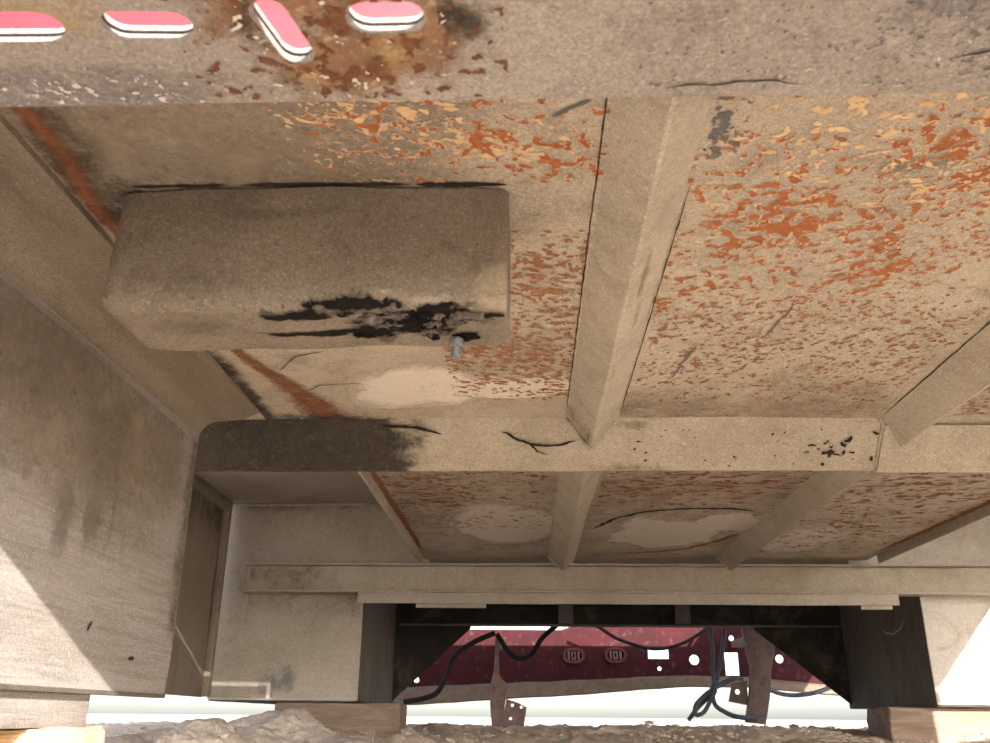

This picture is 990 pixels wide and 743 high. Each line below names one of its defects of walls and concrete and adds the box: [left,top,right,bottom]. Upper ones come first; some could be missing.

corrosion [184,0,611,183]
corrosion [11,107,131,235]
crack [552,98,607,412]
corrosion [628,93,990,403]
corrosion [443,230,591,400]
corrosion [213,349,372,420]
water stain [381,425,442,435]
corrosion [370,471,554,550]
crack [500,431,575,455]
corrosion [593,471,814,514]
spalling [799,436,855,466]
corrosion [761,471,990,554]